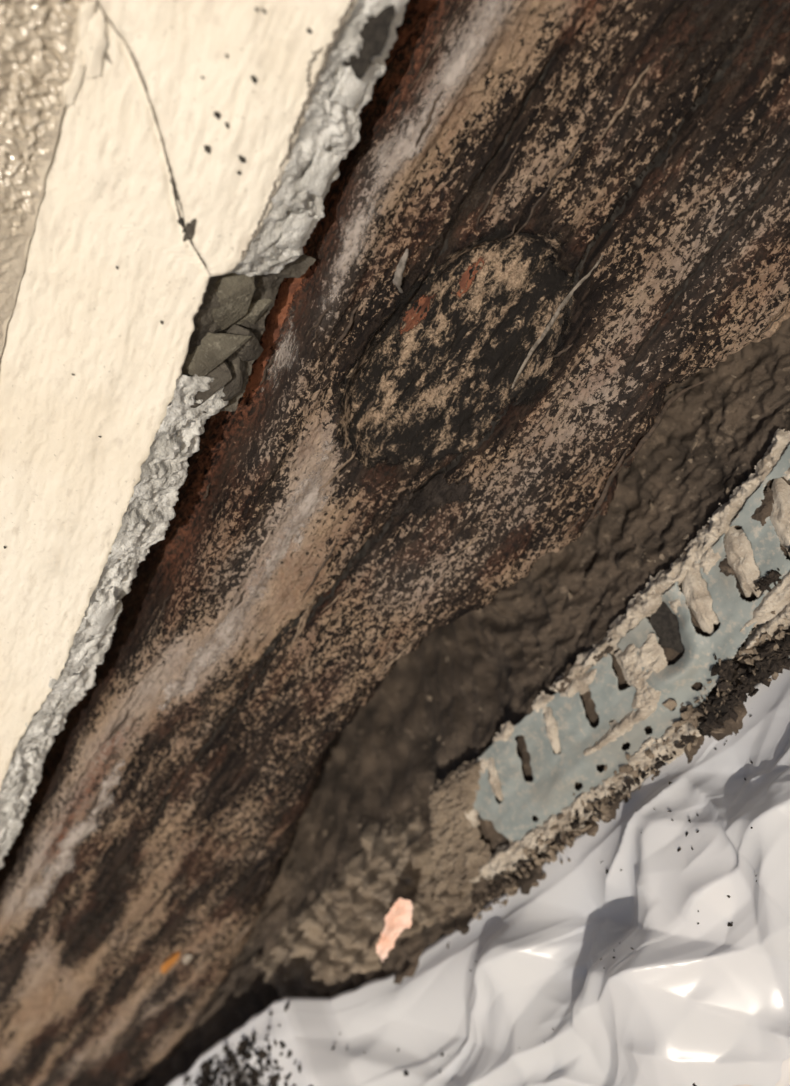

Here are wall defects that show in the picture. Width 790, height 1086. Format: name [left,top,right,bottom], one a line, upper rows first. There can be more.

crack [97,1,212,277]
spalling [0,0,409,868]
peeling [389,470,474,519]
spalling [741,603,790,656]
spalling [469,722,702,883]